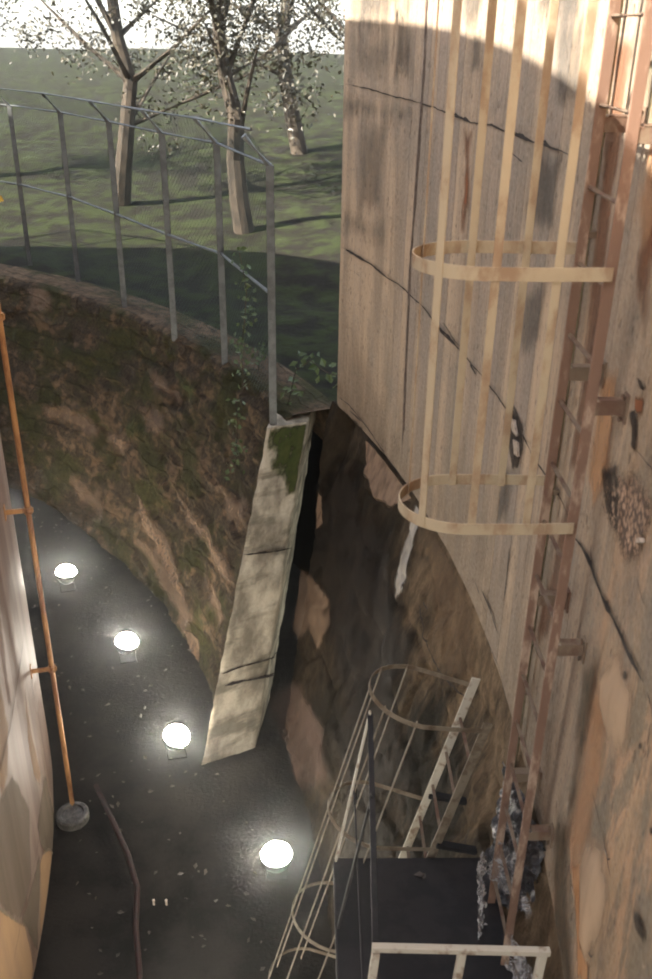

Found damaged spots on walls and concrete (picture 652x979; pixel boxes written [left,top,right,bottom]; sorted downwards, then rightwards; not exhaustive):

crack [337,0,580,478]
crack [475,552,509,697]
crack [575,538,652,787]
spalling [602,465,651,564]